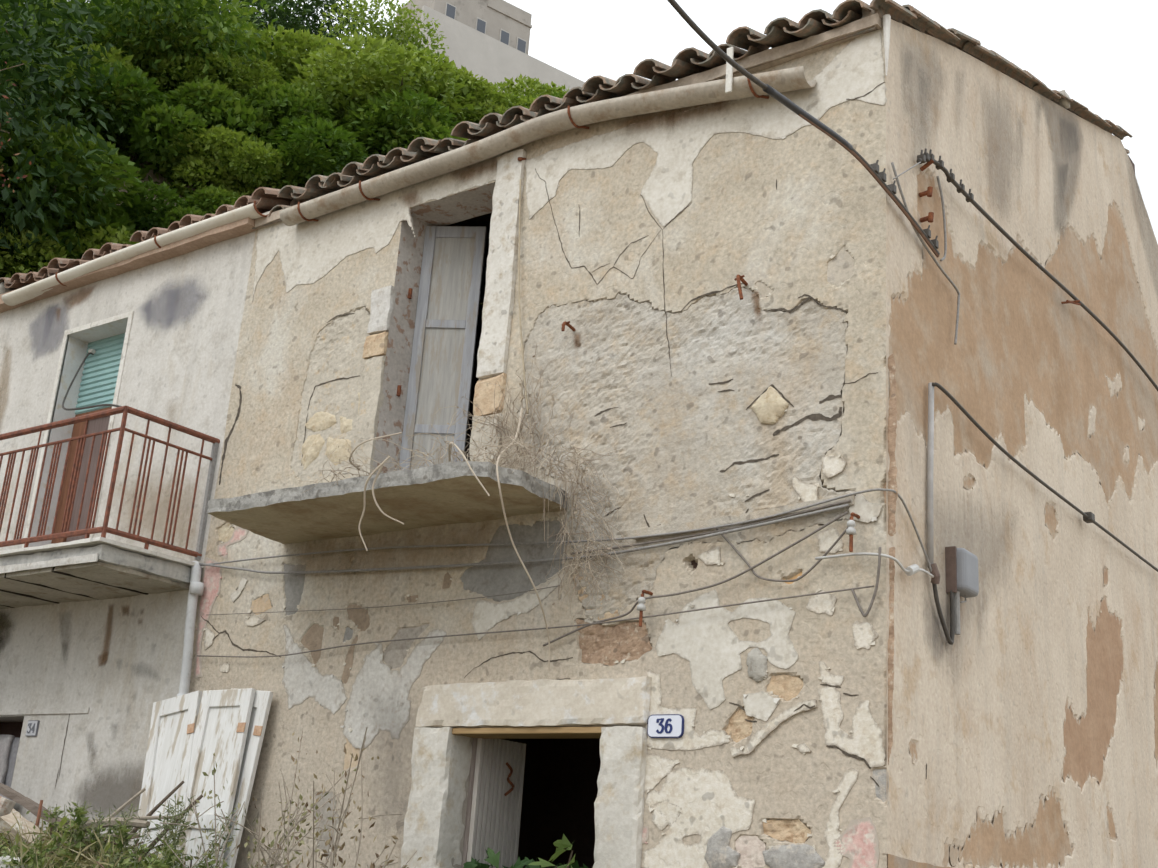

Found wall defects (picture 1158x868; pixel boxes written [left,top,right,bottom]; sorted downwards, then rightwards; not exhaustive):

leakage [33,309,65,351]
leakage [146,287,198,323]
spalling [291,307,370,481]
peeling [252,153,506,302]
crack [535,169,743,377]
spalling [441,170,1158,868]
leakage [0,615,8,645]
rust [102,607,128,662]
peeling [194,522,447,771]